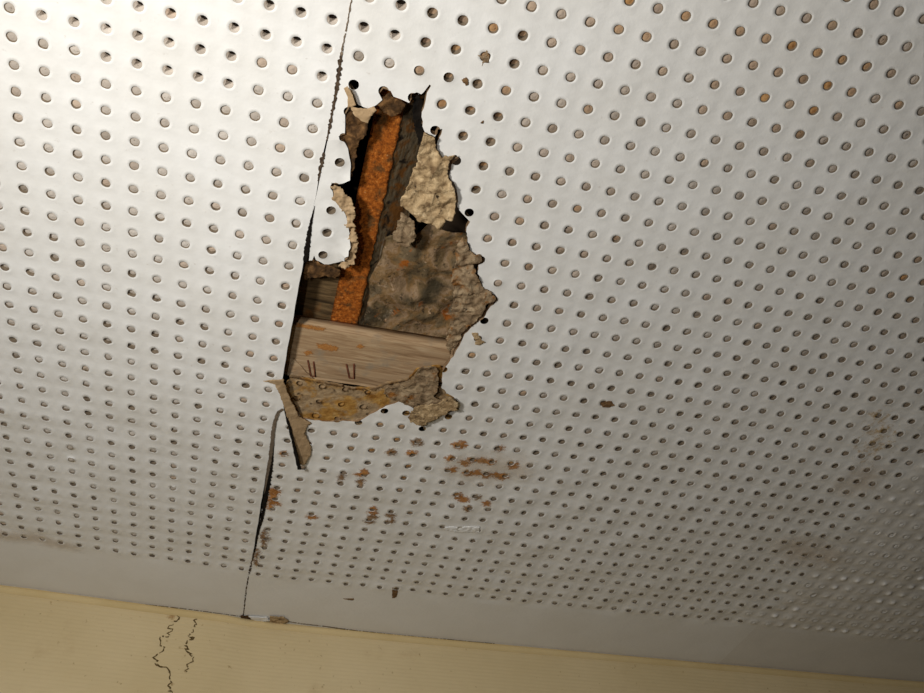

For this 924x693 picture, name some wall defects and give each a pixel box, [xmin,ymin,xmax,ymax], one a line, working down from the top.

crack [317,0,352,181]
crack [303,206,315,262]
spalling [264,82,498,470]
corrosion [338,468,369,486]
corrosion [387,438,423,457]
corrosion [445,441,519,481]
corrosion [266,488,281,510]
corrosion [364,506,395,524]
corrosion [454,492,491,513]
crack [146,408,283,693]